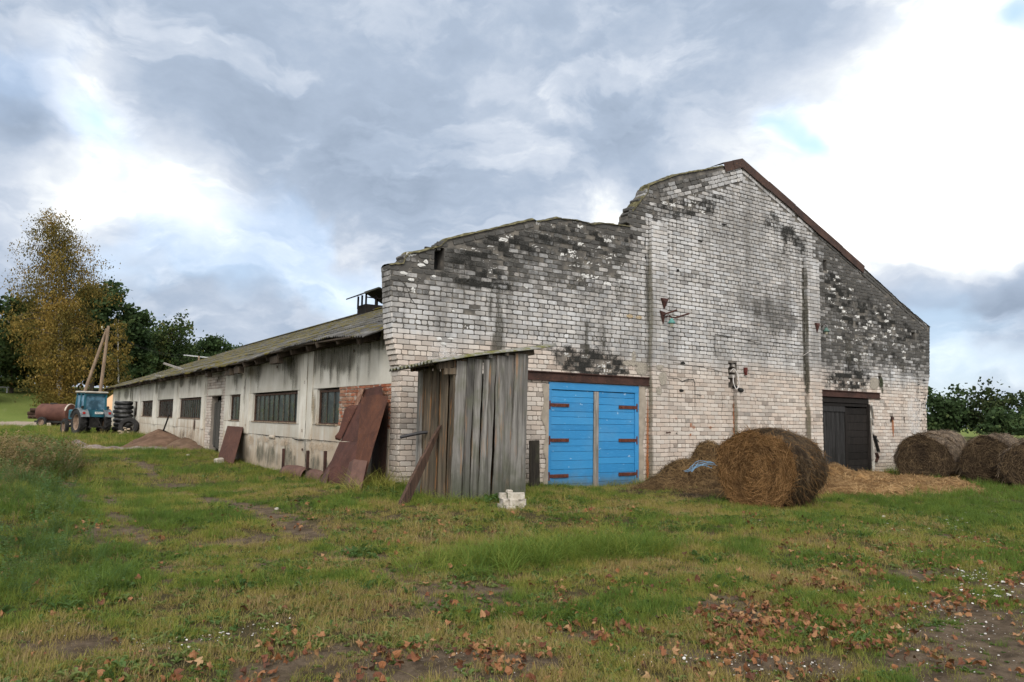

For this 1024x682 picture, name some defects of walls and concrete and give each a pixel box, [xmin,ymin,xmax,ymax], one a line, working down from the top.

spalling [400,252,436,293]
spalling [461,219,646,289]
water stain [764,211,806,256]
water stain [288,334,385,425]
water stain [542,325,630,375]
spalling [827,276,921,365]